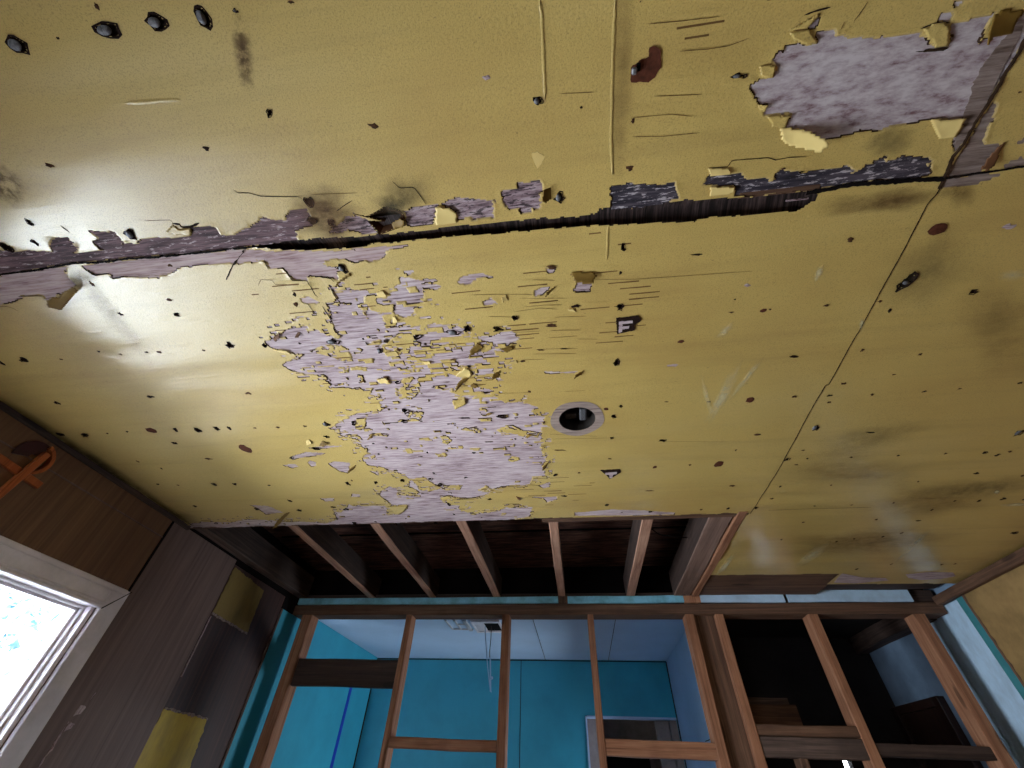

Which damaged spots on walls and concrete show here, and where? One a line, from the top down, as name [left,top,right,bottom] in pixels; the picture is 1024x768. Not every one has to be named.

corrosion [630,46,661,83]
peeling [750,1,1024,187]
peeling [610,182,679,210]
peeling [703,155,932,196]
crack [0,39,1024,514]
peeling [570,271,597,291]
peeling [0,151,557,529]